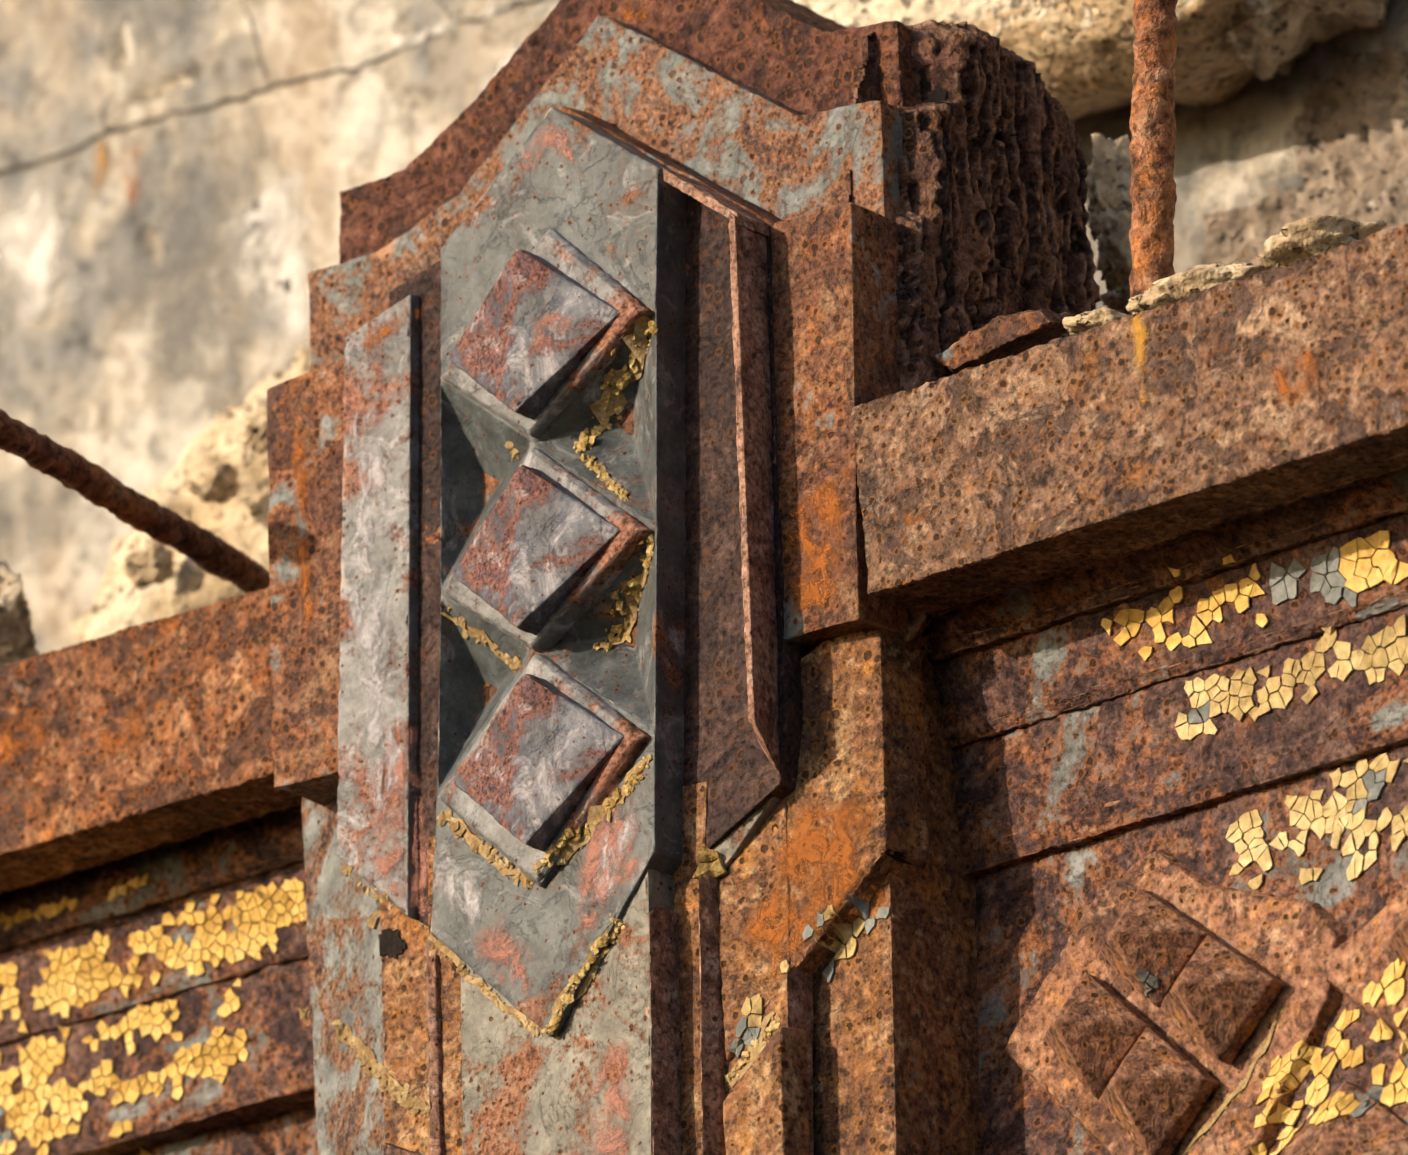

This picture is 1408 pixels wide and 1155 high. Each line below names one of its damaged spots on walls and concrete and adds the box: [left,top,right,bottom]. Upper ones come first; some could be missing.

crack [0,0,542,175]
spalling [1204,42,1408,265]
rust [1133,312,1145,363]
rust [788,484,839,607]
peeling [1101,531,1408,662]
peeling [1175,614,1408,741]
rust [376,732,427,913]
rust [581,789,636,926]
rust [748,805,885,974]
peeling [1226,753,1408,890]
peeling [0,873,306,1155]
peeling [1180,956,1408,1155]